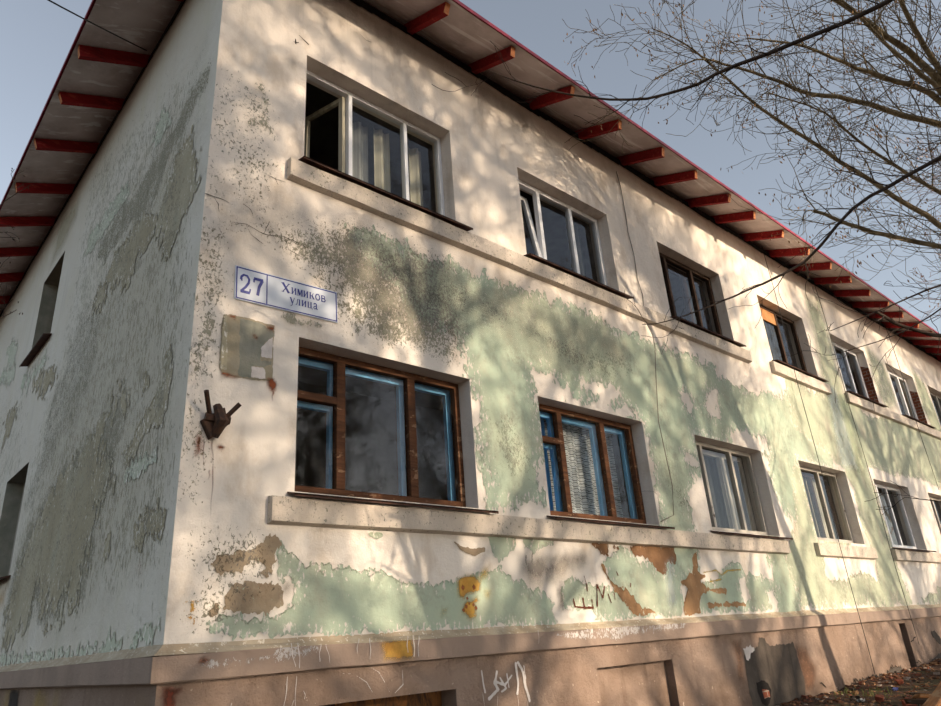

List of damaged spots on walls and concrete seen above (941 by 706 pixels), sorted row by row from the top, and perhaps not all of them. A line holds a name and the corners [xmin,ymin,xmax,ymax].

peeling [91,124,201,322]
peeling [0,338,173,667]
peeling [206,222,941,641]
spalling [756,680,771,706]